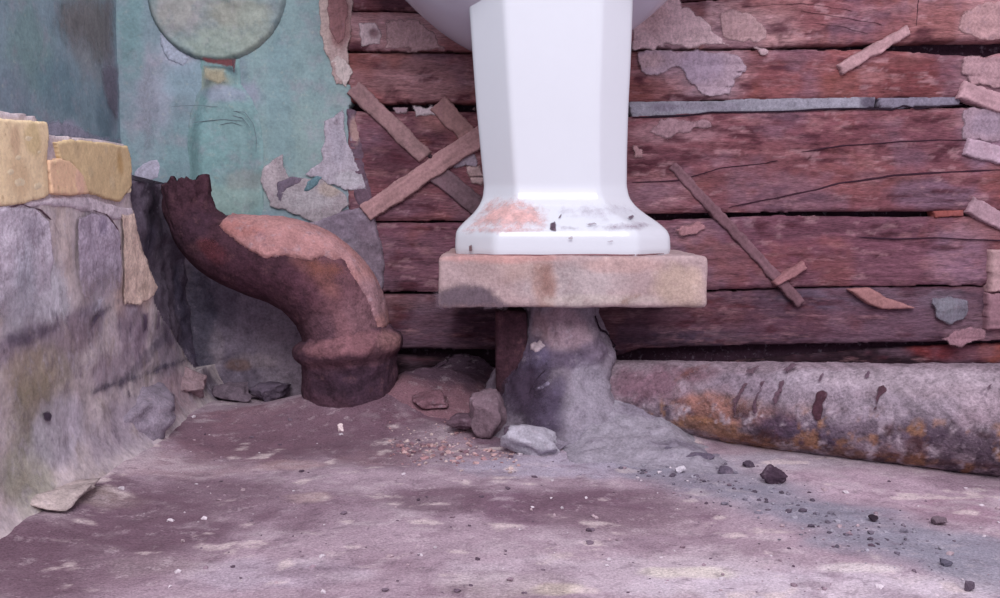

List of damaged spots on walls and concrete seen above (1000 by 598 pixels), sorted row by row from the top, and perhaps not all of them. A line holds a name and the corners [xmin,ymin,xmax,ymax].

spalling [319,0,444,86]
peeling [632,0,768,96]
peeling [962,56,1000,88]
peeling [962,107,1000,142]
crack [802,139,984,152]
spalling [260,108,385,291]
corrosion [475,202,541,228]
crack [633,160,777,183]
crack [731,169,1000,207]
spalling [184,258,302,398]